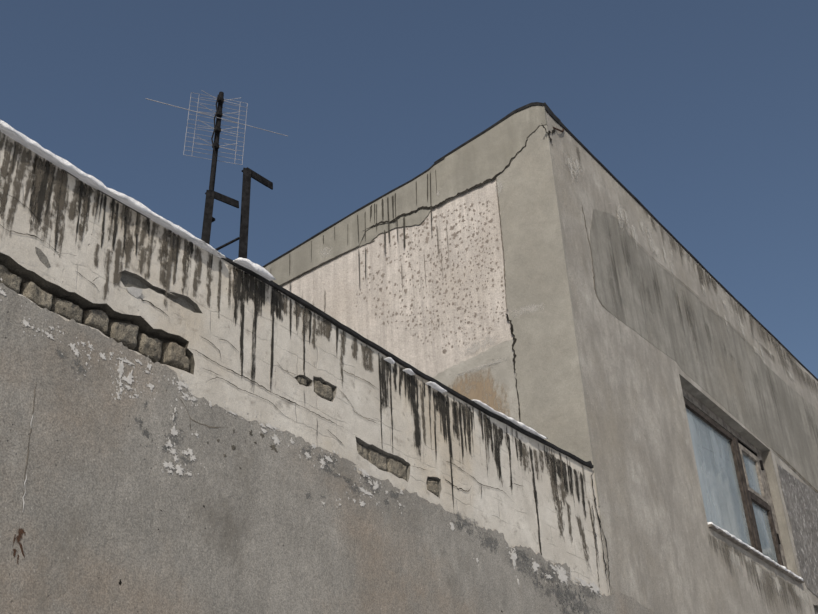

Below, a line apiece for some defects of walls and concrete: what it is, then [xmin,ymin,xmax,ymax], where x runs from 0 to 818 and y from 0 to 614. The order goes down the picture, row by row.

spalling [35,247,51,268]
crack [281,125,555,421]
crack [22,380,37,515]
spalling [0,253,243,479]
water stain [0,133,600,587]
spalling [295,375,337,402]
spalling [249,418,411,514]
rust [13,528,26,563]